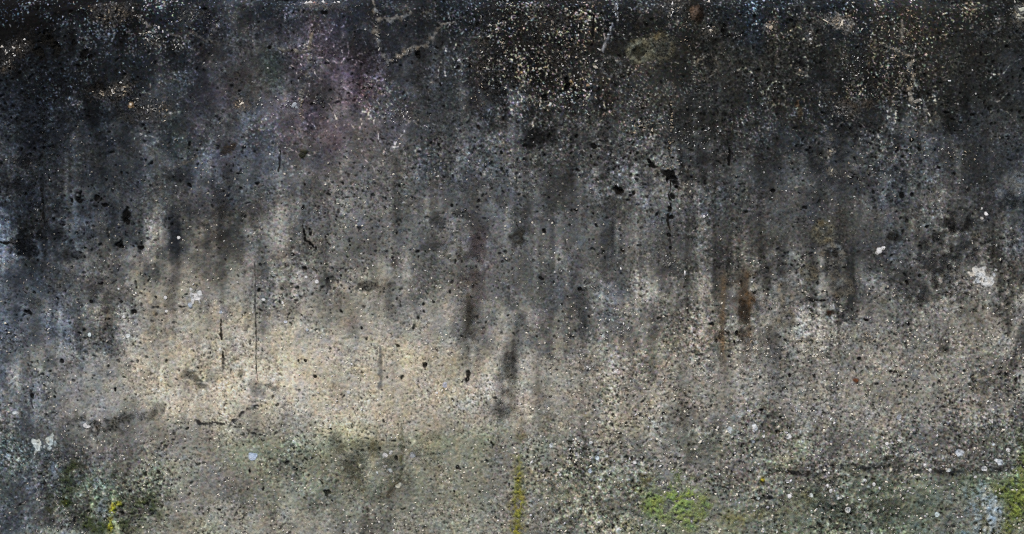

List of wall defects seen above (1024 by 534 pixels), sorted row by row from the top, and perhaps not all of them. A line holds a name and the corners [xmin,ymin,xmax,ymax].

water stain [14,230,39,257]
water stain [919,219,972,272]
rust [738,270,751,341]
water stain [505,339,516,379]
water stain [79,414,131,436]